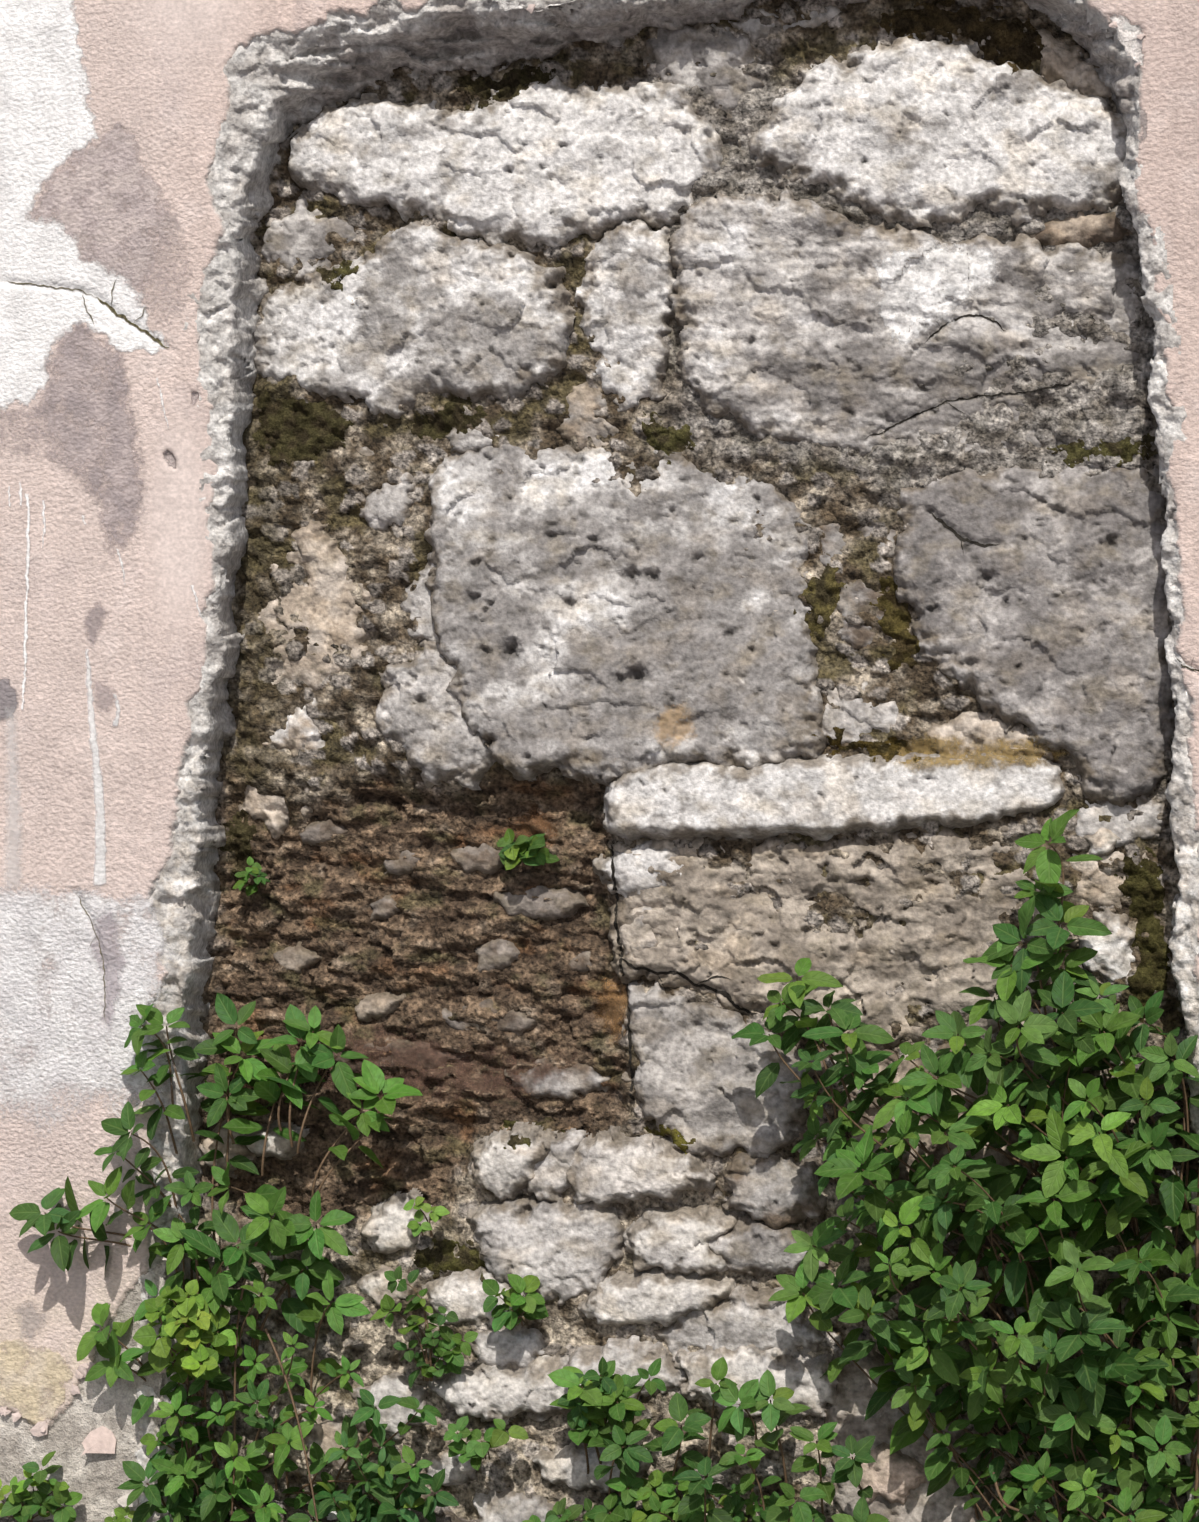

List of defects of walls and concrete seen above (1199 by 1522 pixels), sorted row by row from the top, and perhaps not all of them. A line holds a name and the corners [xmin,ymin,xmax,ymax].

leakage [0,324,143,546]
crack [8,278,169,348]
leakage [29,123,188,310]
crack [926,314,1003,342]
crack [867,382,1074,438]
spalling [1023,0,1199,1163]
spalling [0,0,755,1522]
crack [609,843,758,1104]